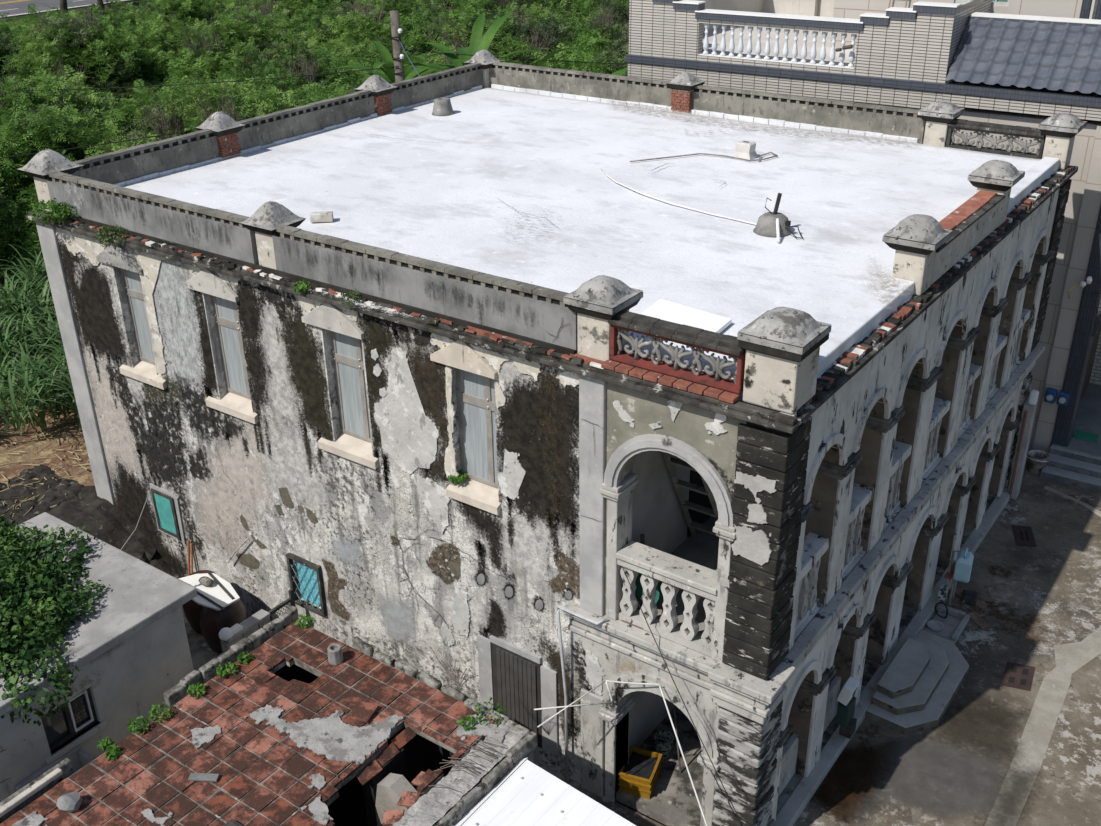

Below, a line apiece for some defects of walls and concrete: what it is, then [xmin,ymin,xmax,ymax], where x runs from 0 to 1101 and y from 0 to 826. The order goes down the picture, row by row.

leakage [305,286,434,347]
leakage [58,234,301,578]
flaking render [613,400,635,428]
flaking render [649,400,683,429]
flaking render [705,413,727,435]
flaking render [272,487,318,527]
flaking render [371,348,471,637]
leakage [456,363,580,580]
flaking render [731,472,777,566]
flaking render [321,558,351,621]